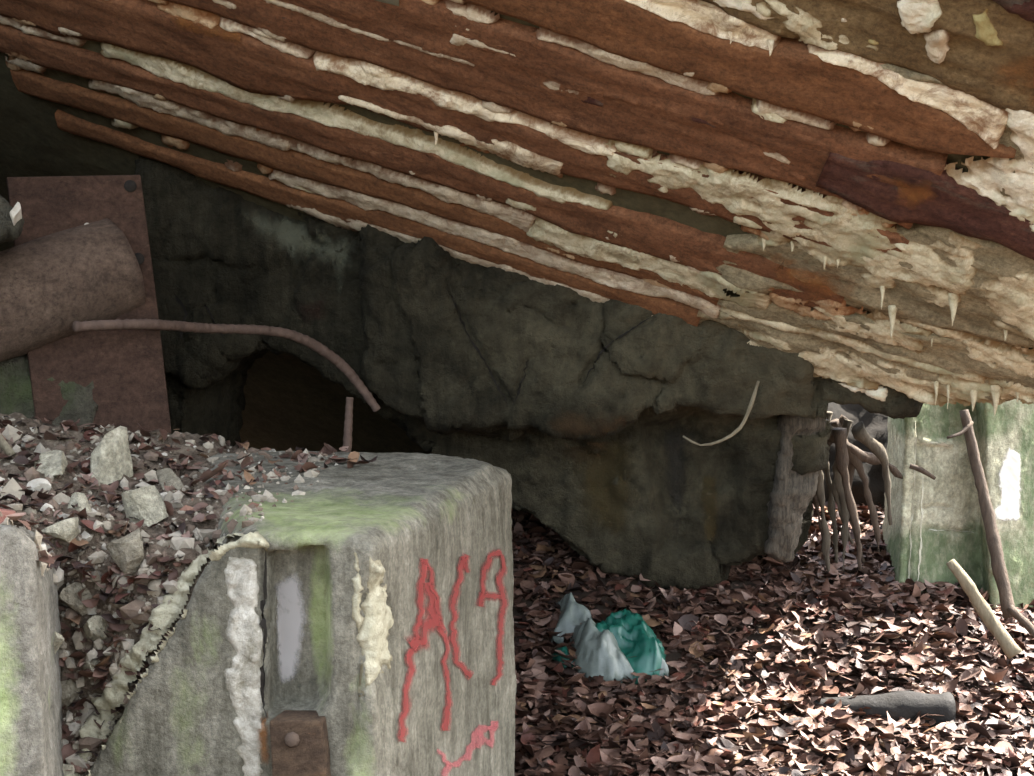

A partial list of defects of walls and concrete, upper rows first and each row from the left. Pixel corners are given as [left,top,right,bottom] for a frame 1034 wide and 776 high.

peeling [422,0,500,24]
damp [0,15,86,47]
damp [5,56,47,75]
peeling [482,100,514,113]
peeling [751,98,787,123]
peeling [615,140,729,173]
spalling [10,202,22,226]
damp [88,0,1034,416]
peeling [733,216,769,240]
spalling [72,319,381,452]
peeling [995,449,1021,520]
crack [259,551,267,716]